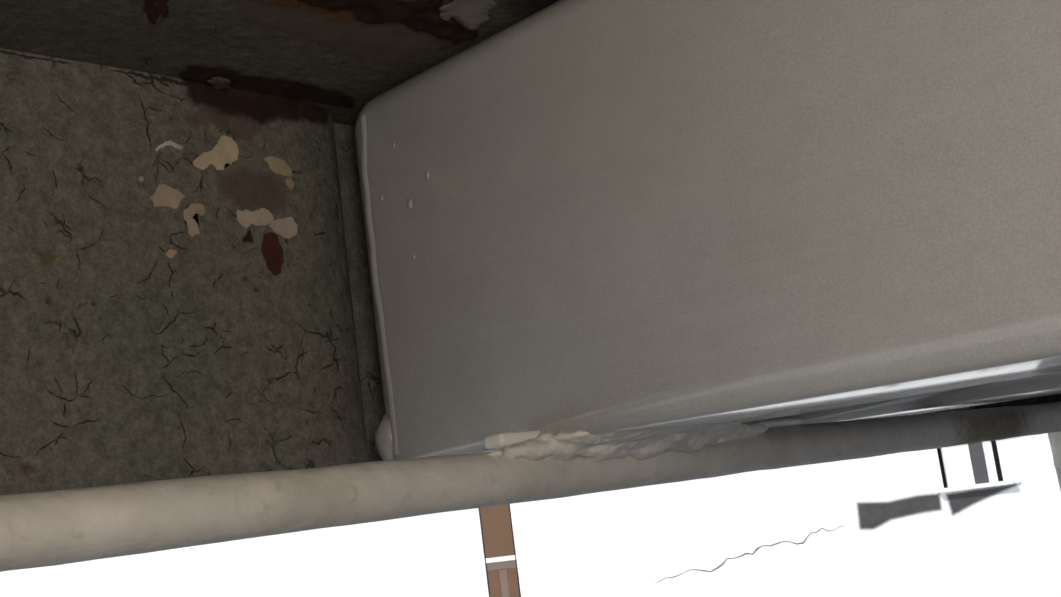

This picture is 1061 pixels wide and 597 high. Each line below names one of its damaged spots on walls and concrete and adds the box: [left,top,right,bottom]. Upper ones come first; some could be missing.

spalling [299,0,497,44]
crack [0,50,71,80]
crack [0,122,57,202]
peeling [155,140,183,152]
peeling [193,135,239,170]
peeling [264,156,294,189]
peeling [149,184,205,238]
peeling [235,208,298,239]
crack [111,232,233,449]
crack [263,338,338,404]
crack [0,372,92,458]